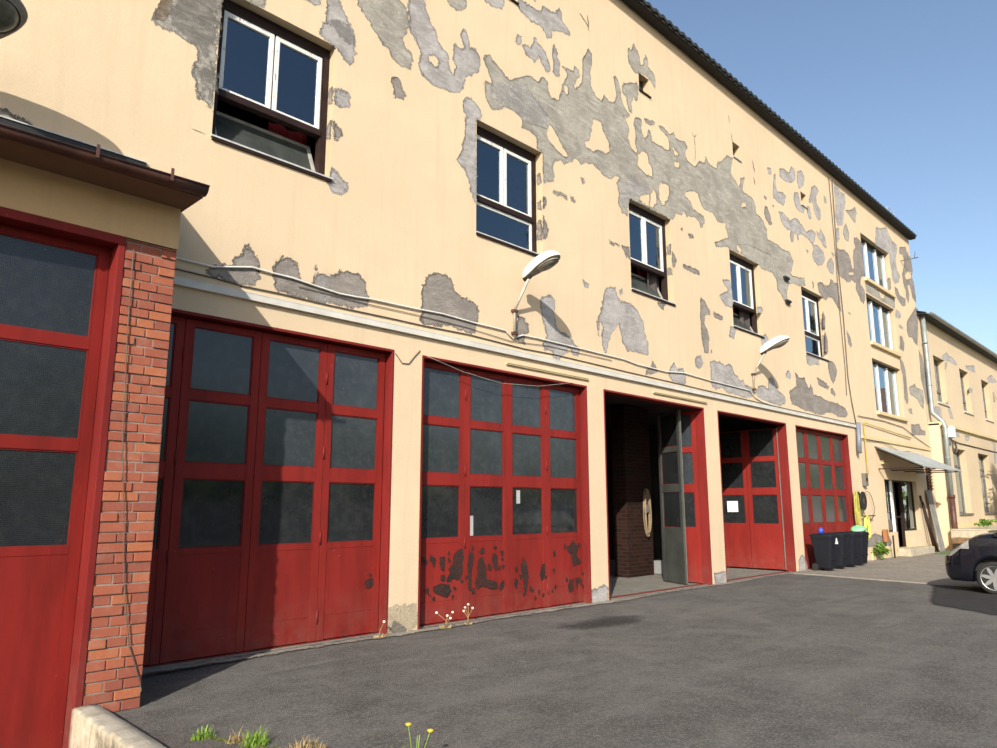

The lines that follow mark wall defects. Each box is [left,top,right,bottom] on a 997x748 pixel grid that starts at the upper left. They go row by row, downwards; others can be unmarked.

flaking render [151,0,223,112]
flaking render [307,0,357,66]
flaking render [0,108,33,125]
flaking render [326,120,343,141]
flaking render [328,86,351,108]
flaking render [326,167,349,196]
flaking render [358,0,970,441]
flaking render [205,243,369,309]
peeling [422,541,584,601]